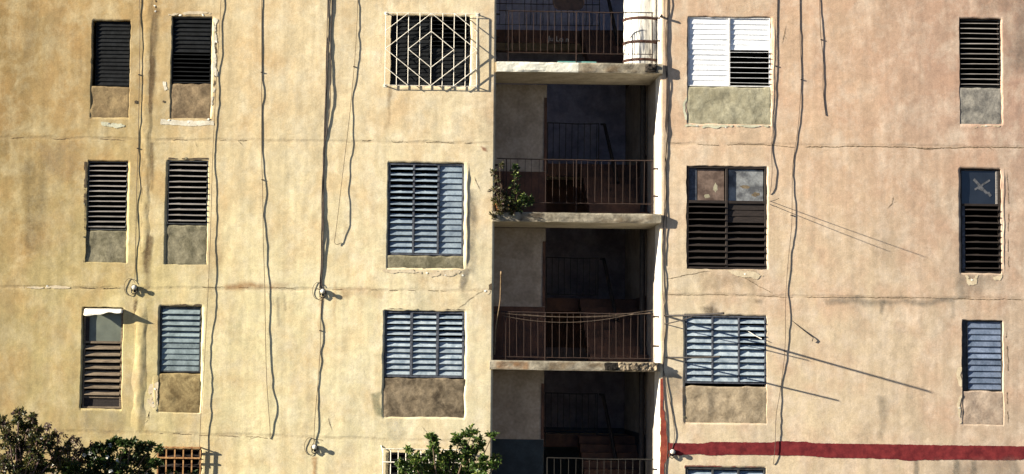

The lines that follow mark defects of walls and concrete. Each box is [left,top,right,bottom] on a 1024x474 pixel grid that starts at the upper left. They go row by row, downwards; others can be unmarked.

flaking render [154,1,219,126]
crack [665,271,1021,300]
spalling [604,362,659,372]